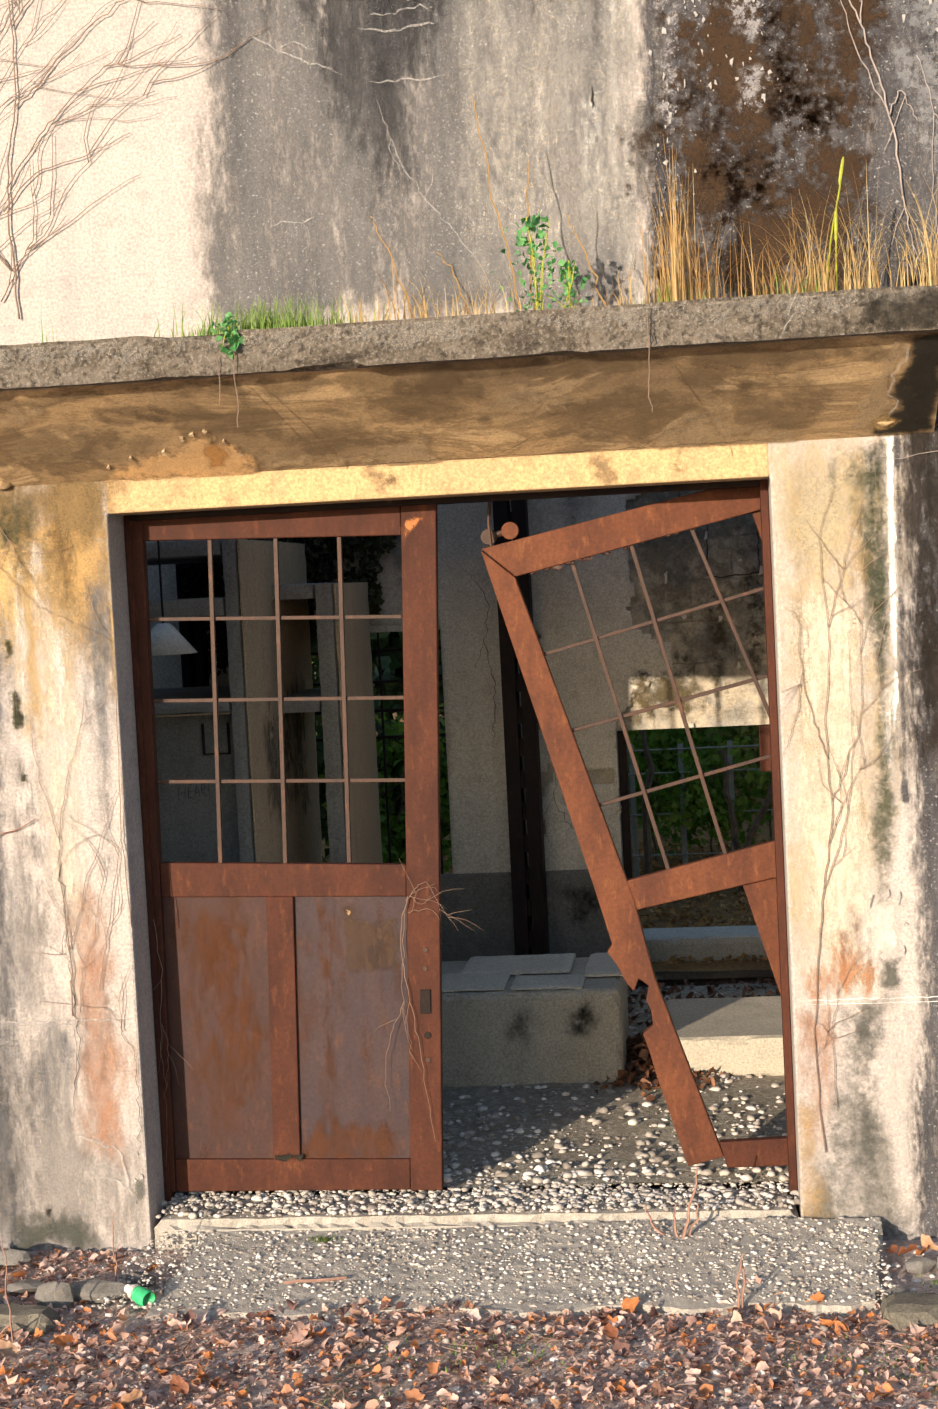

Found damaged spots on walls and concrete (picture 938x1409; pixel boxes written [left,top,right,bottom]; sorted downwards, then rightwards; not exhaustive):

damp [0,481,114,917]
spalling [107,428,255,481]
damp [204,0,938,1238]
flaking render [704,525,763,578]
damp [0,868,141,1251]
corrosion [808,949,874,999]